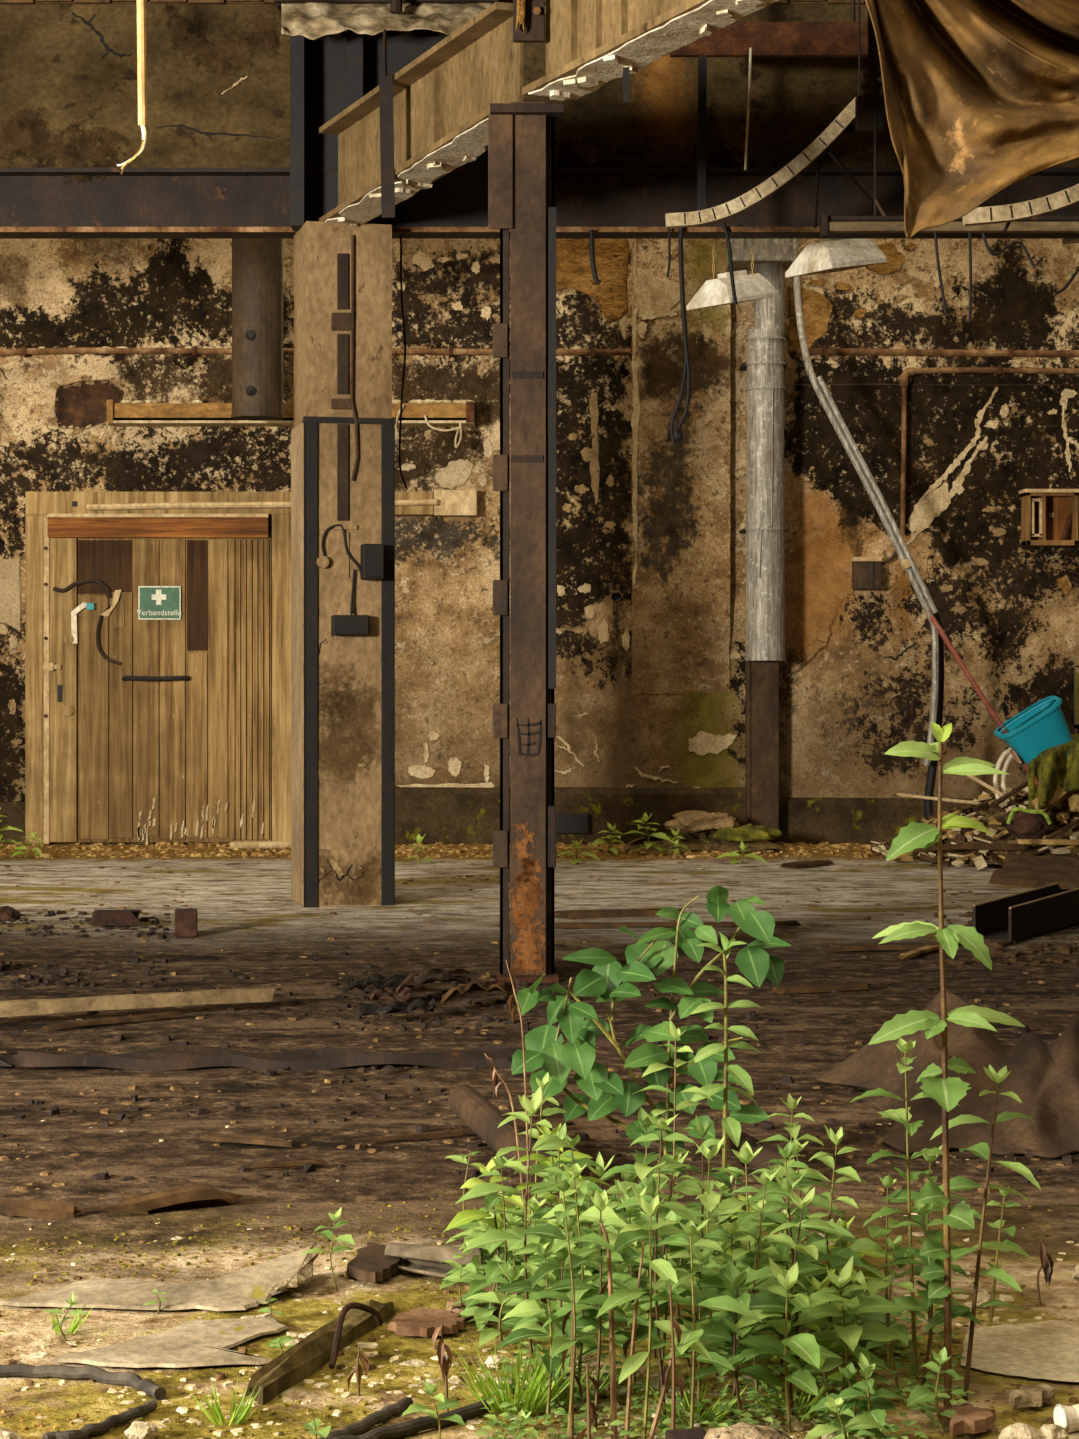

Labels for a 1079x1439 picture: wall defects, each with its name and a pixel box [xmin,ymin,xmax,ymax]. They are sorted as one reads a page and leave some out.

leakage [0,239,232,372]
leakage [283,280,294,360]
leakage [392,239,500,376]
leakage [0,421,294,559]
leakage [556,290,709,771]
leakage [784,239,1079,783]
peeling [940,584,967,614]
peeling [905,387,1009,545]
peeling [1047,389,1079,472]
peeling [1057,575,1072,595]
leakage [0,611,25,802]
rust [509,823,546,975]